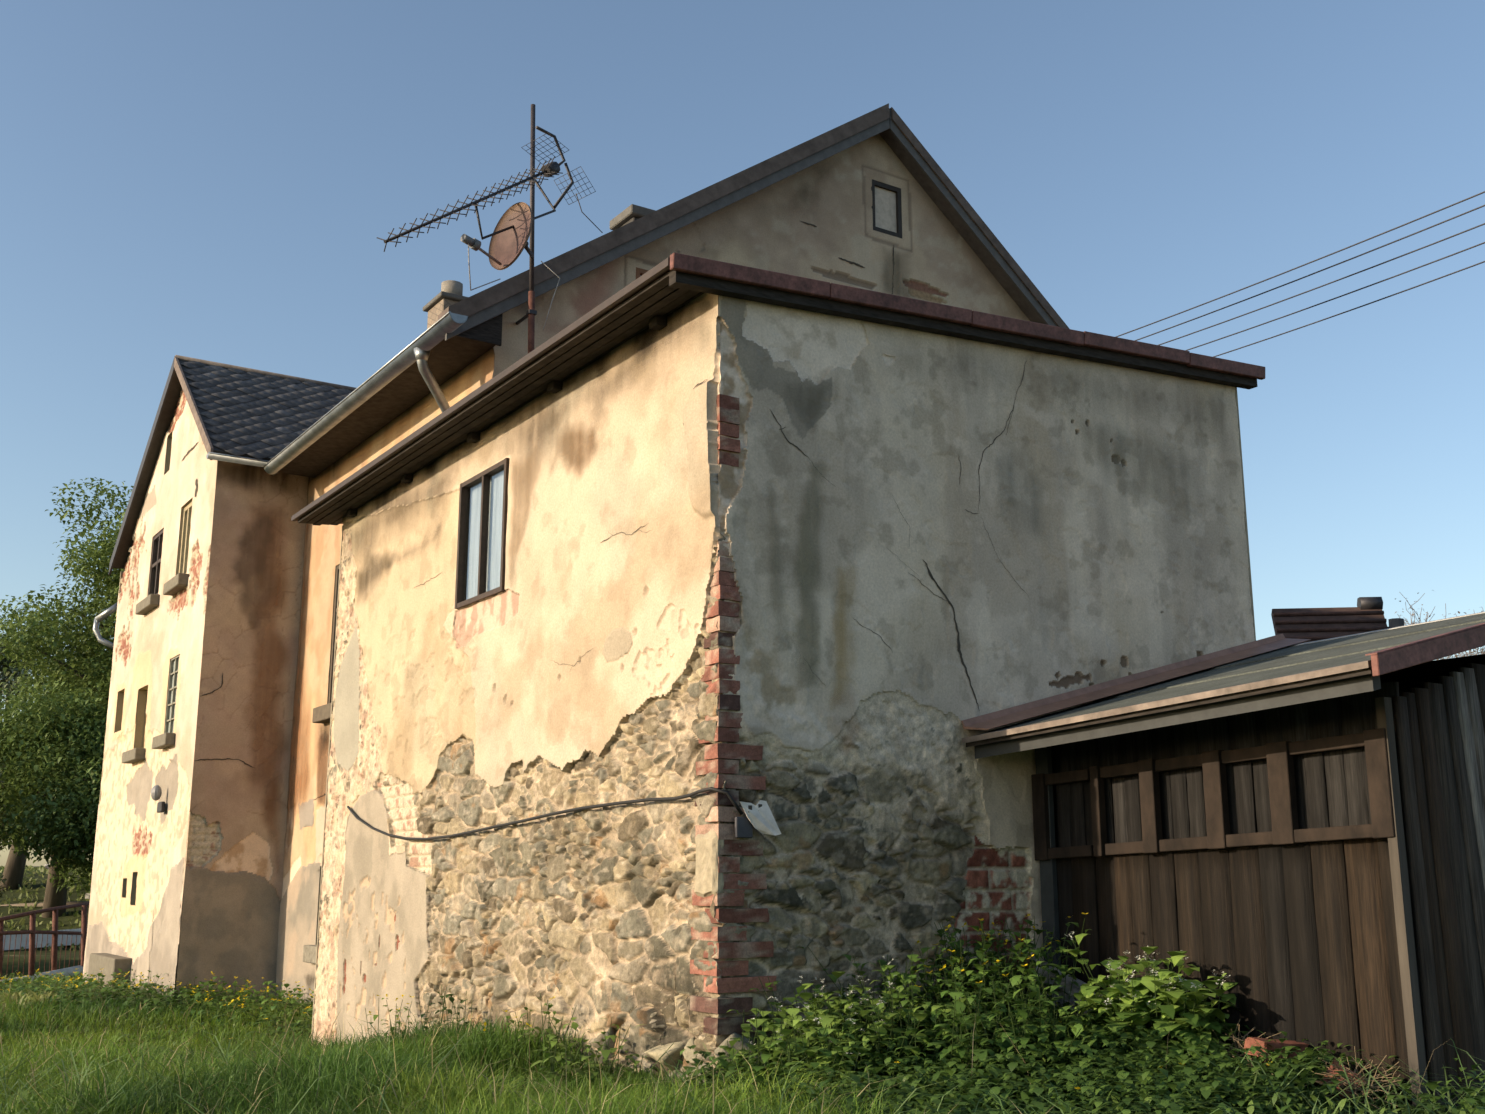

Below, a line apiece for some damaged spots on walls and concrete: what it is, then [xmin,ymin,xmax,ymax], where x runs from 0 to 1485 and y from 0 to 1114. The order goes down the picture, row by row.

crack [959,361,1029,597]
flaking render [95,301,1037,1090]
crack [894,500,980,711]